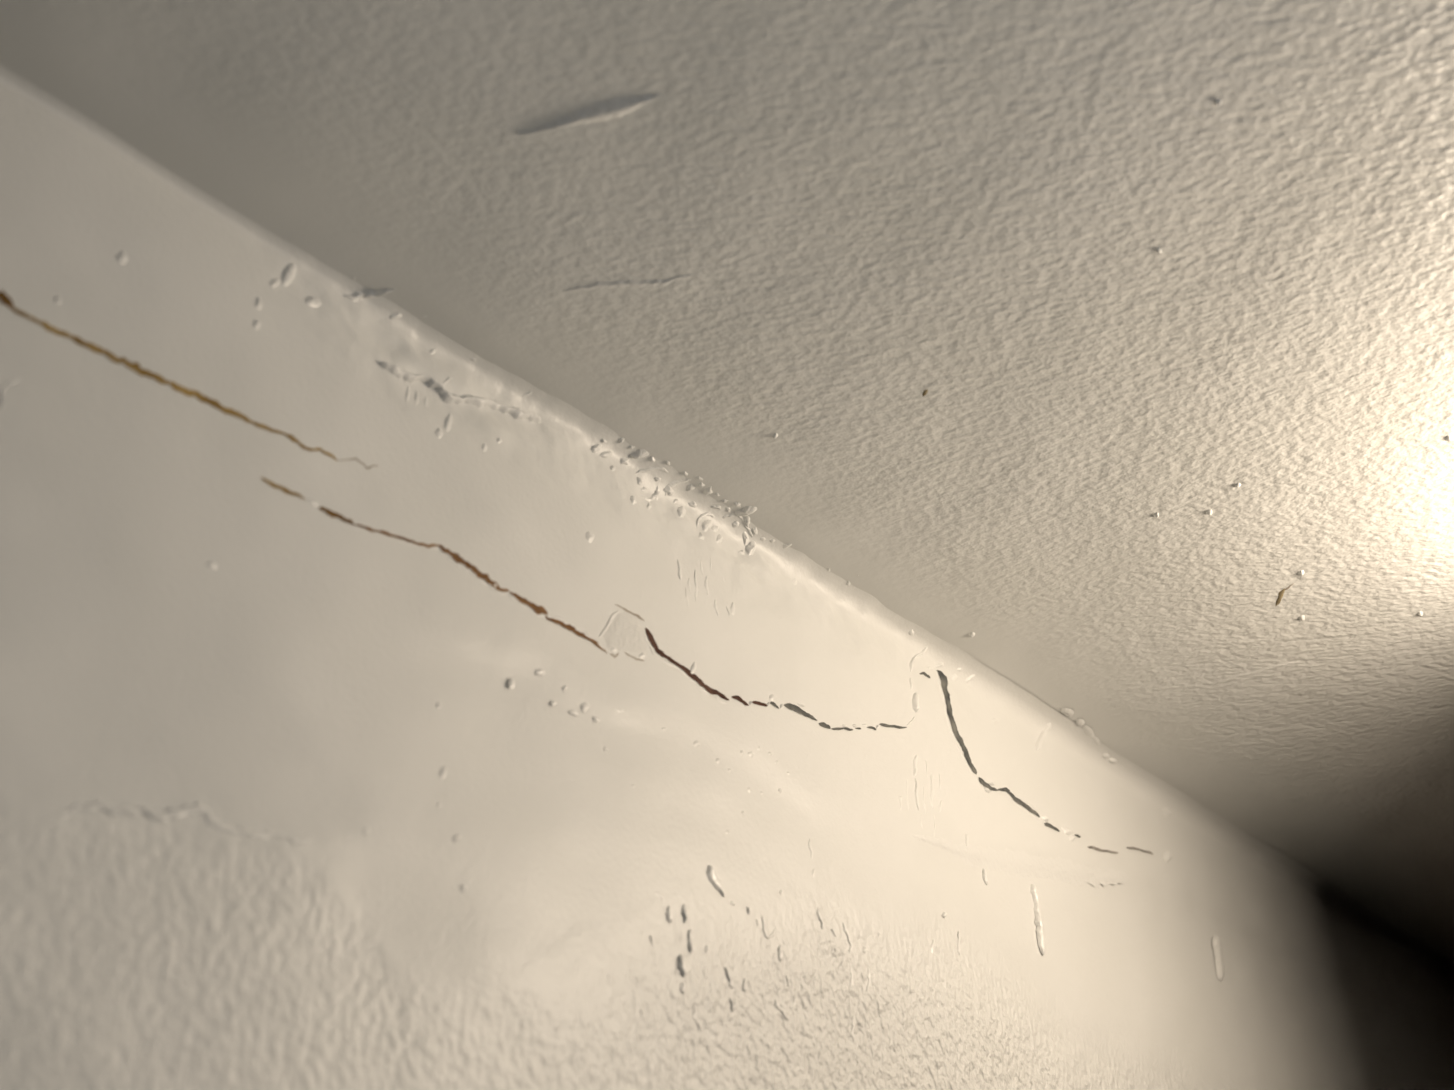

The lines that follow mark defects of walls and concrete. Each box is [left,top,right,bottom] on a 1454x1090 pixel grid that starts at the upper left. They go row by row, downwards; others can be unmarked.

crack [0,288,380,469]
crack [260,477,907,731]
crack [920,670,1172,863]